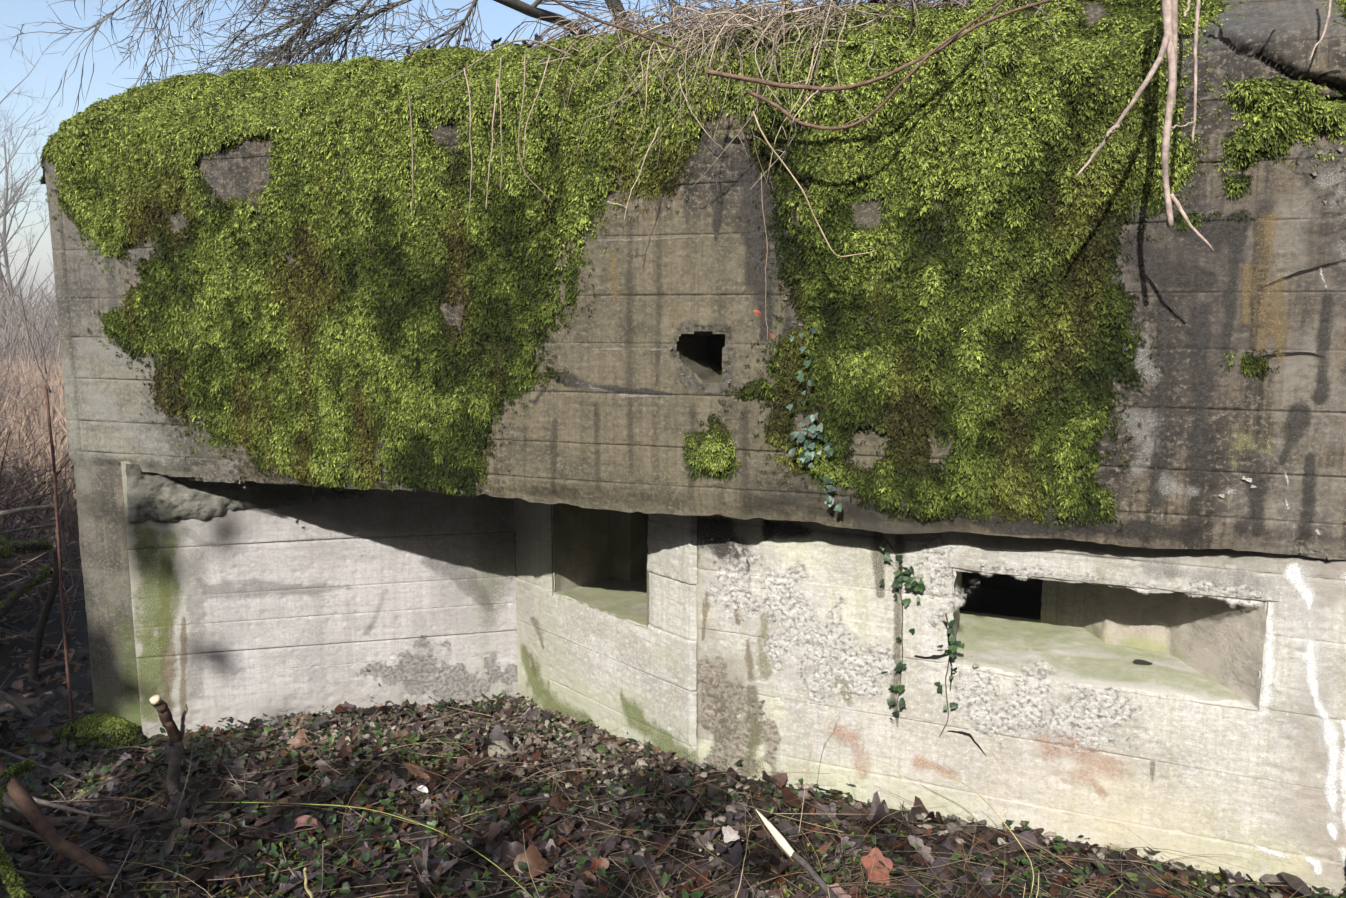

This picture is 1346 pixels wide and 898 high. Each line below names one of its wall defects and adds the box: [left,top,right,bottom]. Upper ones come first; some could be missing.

crack [1260,259,1346,288]
spalling [670,323,736,395]
leakage [944,205,1272,542]
leakage [1267,268,1333,545]
spalling [118,457,372,524]
leakage [156,532,179,648]
spalling [705,545,896,702]
leakage [620,679,763,778]
leakage [1285,562,1346,865]